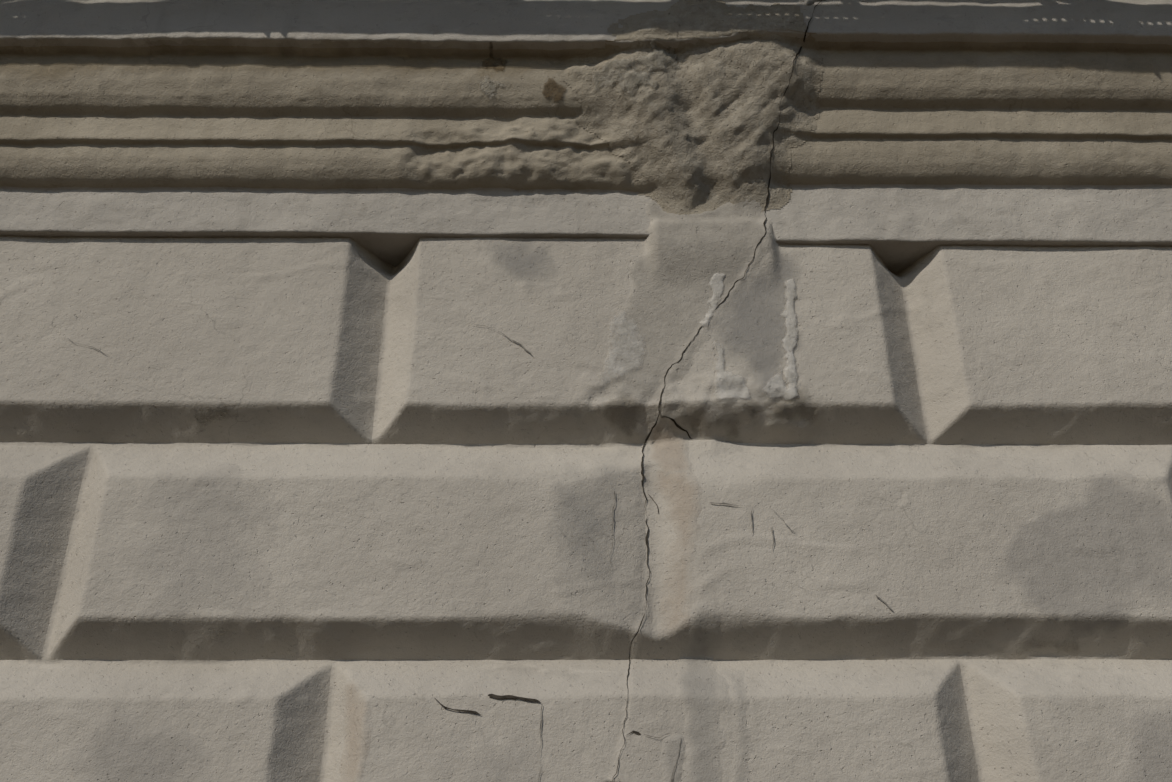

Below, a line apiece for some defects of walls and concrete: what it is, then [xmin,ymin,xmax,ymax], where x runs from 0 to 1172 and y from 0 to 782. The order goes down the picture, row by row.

crack [610,0,822,782]